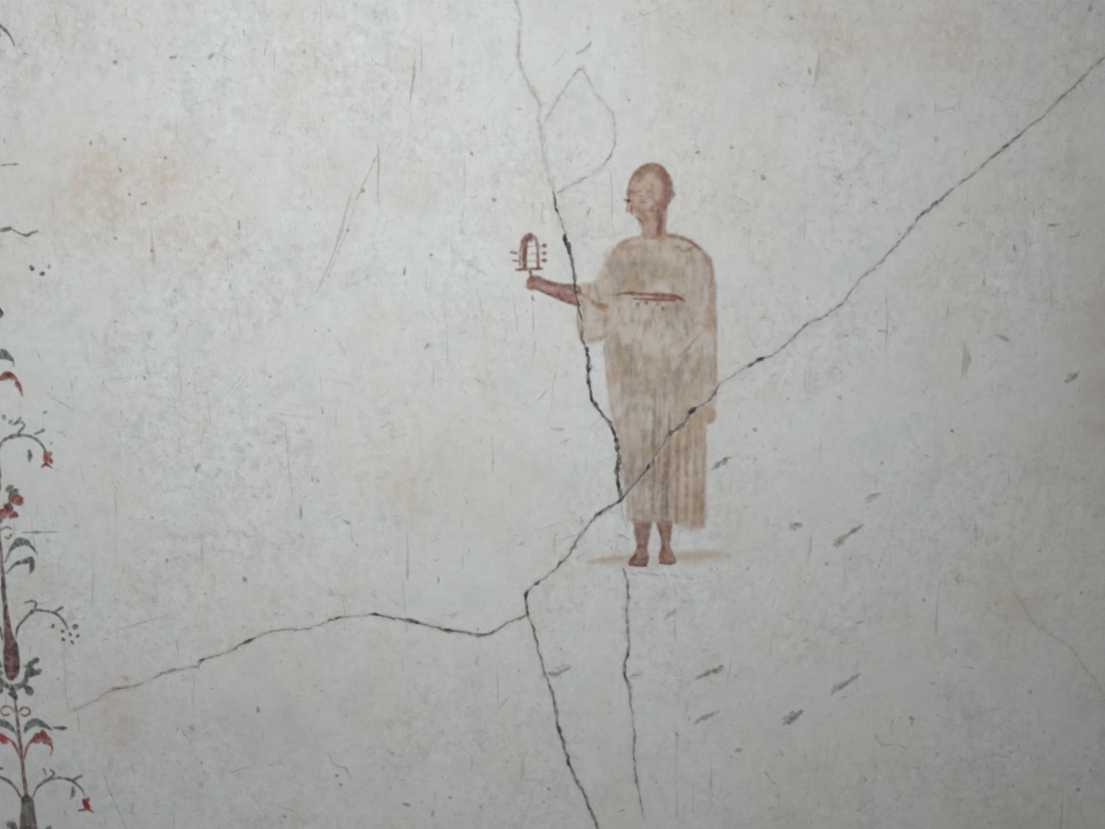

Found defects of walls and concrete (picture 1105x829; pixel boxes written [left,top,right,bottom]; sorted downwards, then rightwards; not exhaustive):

crack [510,0,1105,613]
crack [60,609,602,829]
crack [618,566,649,822]